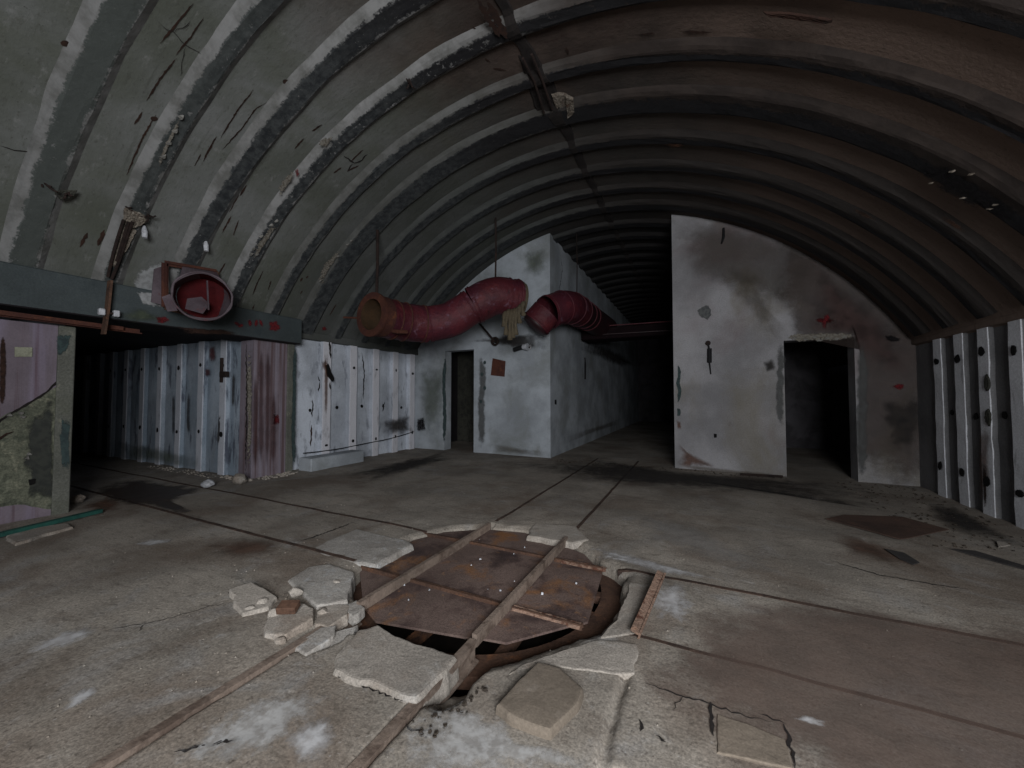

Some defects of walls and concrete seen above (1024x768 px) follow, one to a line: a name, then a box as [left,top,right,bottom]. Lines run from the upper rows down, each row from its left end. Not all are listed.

spalling [106,208,147,279]
peeling [0,382,70,509]
water stain [100,481,196,512]
corrosion [512,605,581,630]
crack [646,683,796,768]